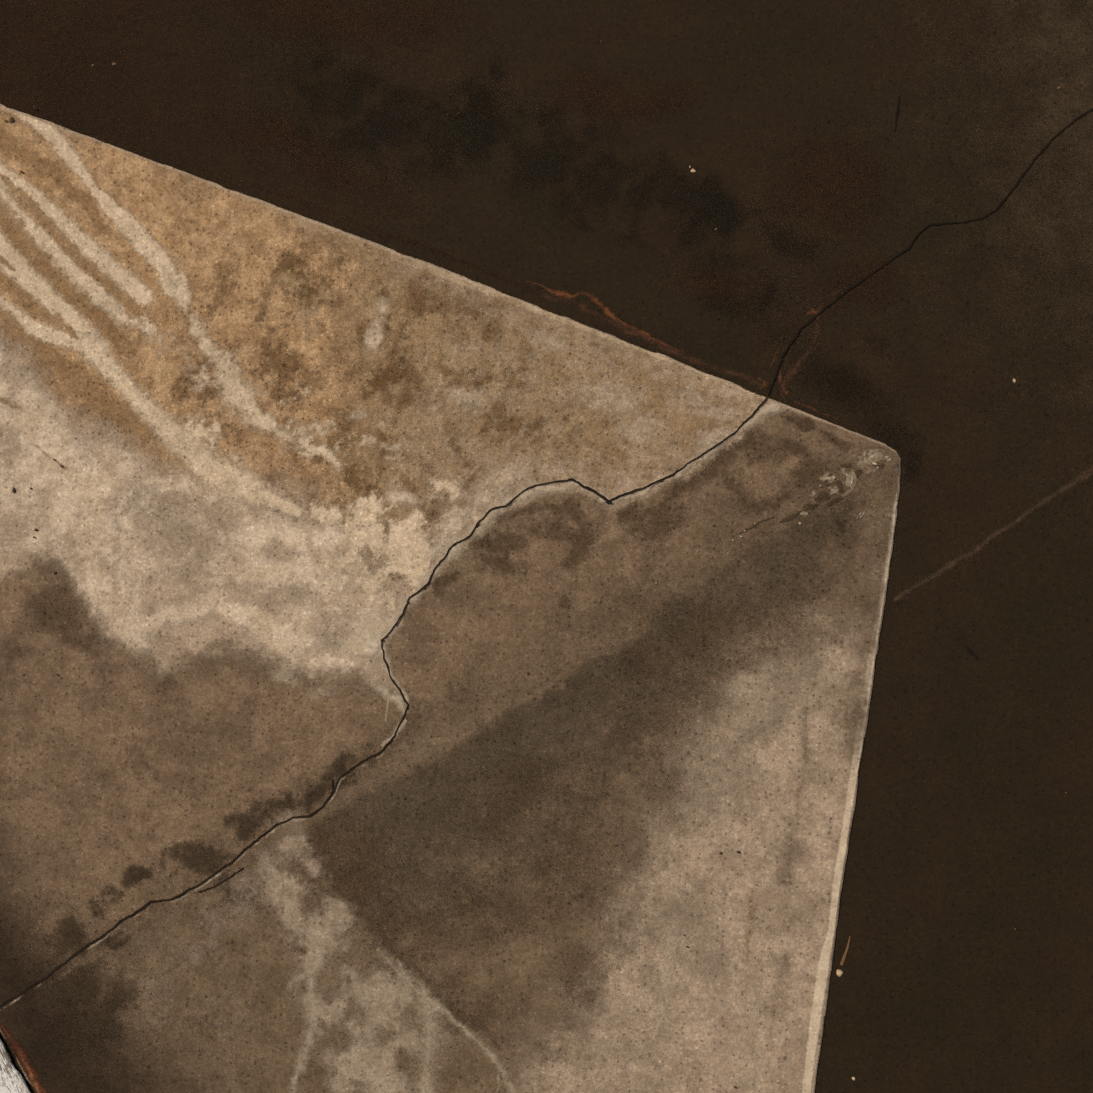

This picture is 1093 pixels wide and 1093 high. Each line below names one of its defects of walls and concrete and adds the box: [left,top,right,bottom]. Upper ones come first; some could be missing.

corrosion [526,281,766,386]
crack [768,108,1093,396]
crack [0,397,780,1007]
leakage [0,109,898,1093]
corrosion [0,1025,46,1093]